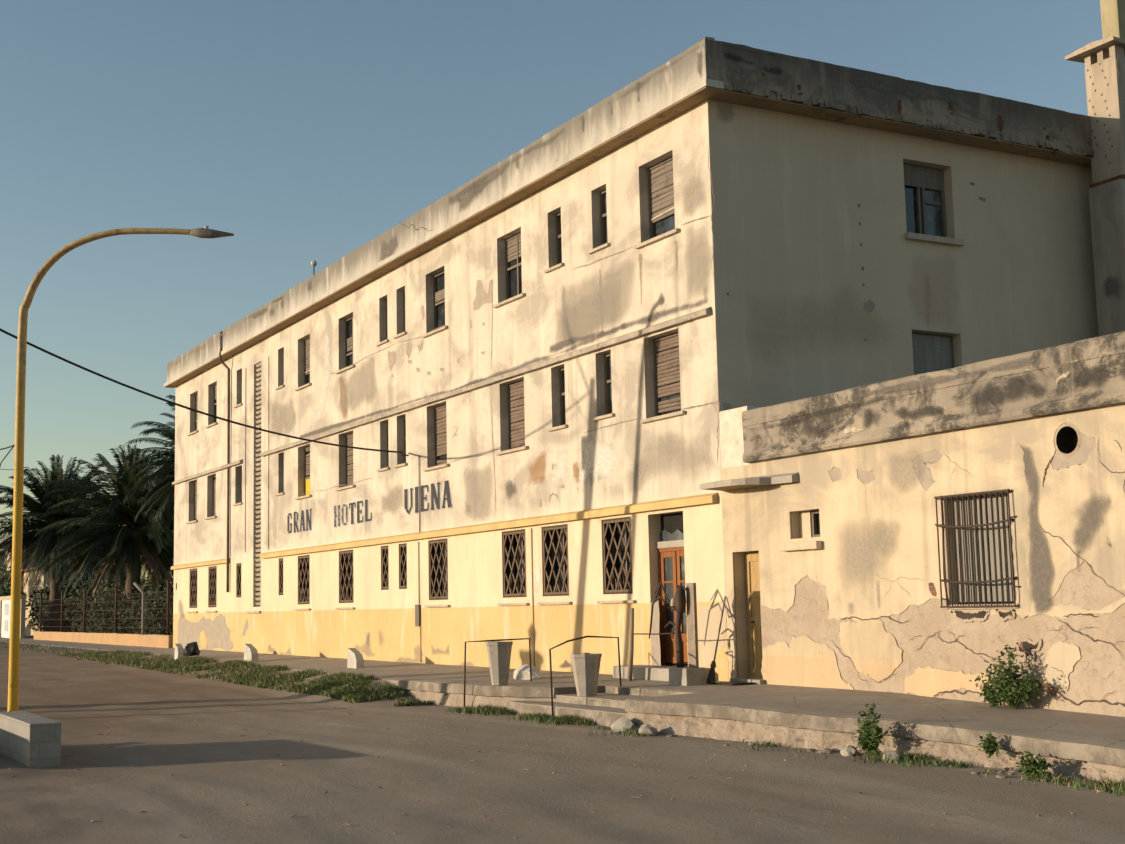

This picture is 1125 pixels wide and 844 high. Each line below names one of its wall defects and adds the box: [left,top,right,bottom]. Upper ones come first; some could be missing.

leakage [450,150,530,209]
leakage [381,239,396,260]
leakage [769,358,1042,445]
leakage [1074,368,1104,386]
peeling [857,469,875,484]
peeling [912,450,943,491]
leakage [1022,448,1053,612]
crack [1027,460,1124,596]
leakage [1075,499,1108,563]
peeling [177,614,249,651]
flaking render [760,562,1125,717]